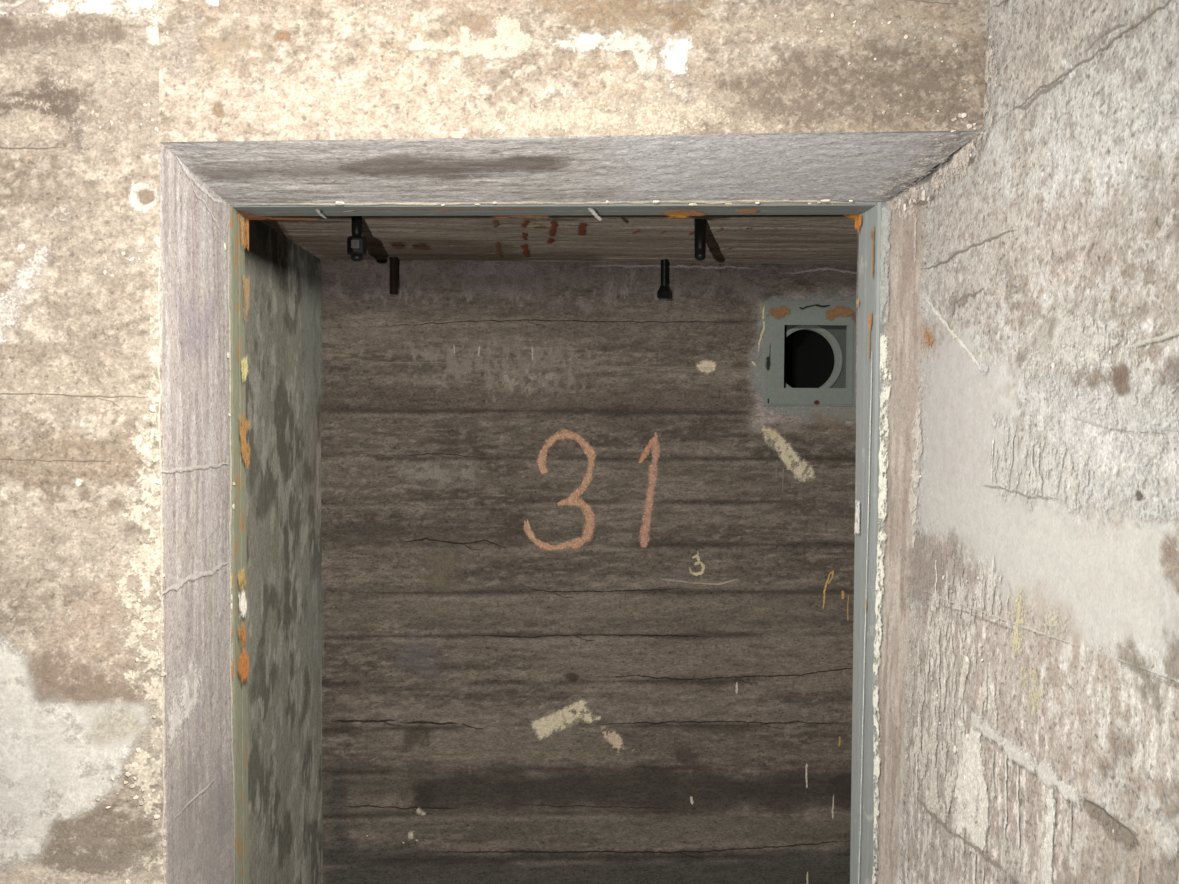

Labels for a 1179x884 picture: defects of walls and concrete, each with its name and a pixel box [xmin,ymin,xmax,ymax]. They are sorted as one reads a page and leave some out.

crack [986,0,1170,118]
rust [645,207,710,218]
crack [921,230,1013,373]
damp [30,648,143,702]
damp [42,813,160,876]
crack [916,797,1018,884]